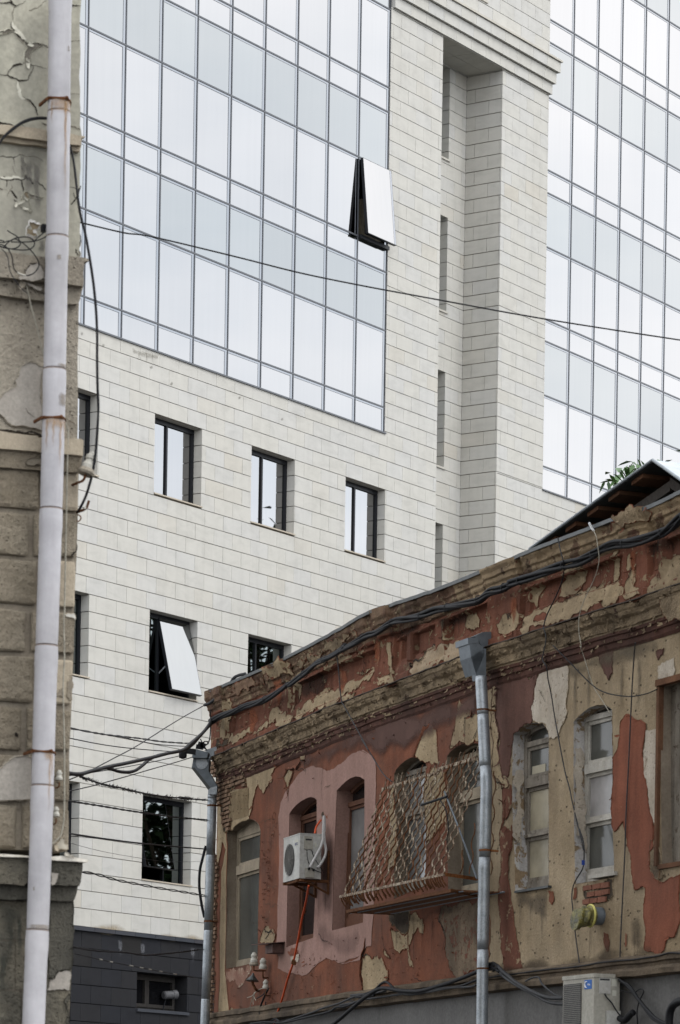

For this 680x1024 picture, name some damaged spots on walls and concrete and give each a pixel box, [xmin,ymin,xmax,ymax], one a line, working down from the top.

crack [0,0,80,127]
crack [0,409,42,436]
peeling [204,504,680,1013]